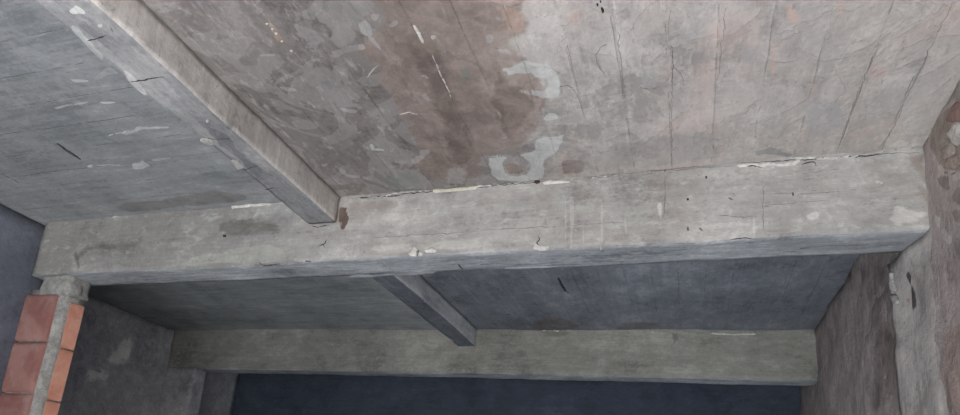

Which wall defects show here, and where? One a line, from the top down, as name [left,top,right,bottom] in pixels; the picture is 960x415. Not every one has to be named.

peeling [484,33,563,100]
crack [52,143,81,160]
water stain [346,0,586,249]
peeling [359,112,670,199]
crack [569,0,949,252]
corrosion [338,206,350,231]
crack [458,262,569,293]